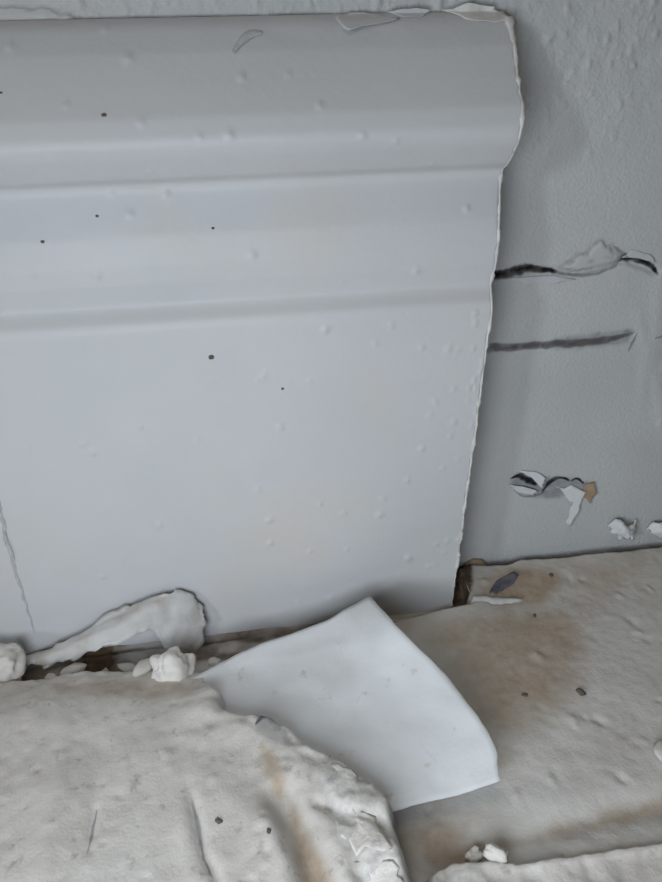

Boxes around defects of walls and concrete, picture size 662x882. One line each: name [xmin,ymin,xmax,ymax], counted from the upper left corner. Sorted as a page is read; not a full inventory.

peeling [335,3,509,30]
crack [494,241,657,284]
crack [493,335,633,351]
spalling [509,470,597,527]
peeling [608,519,662,541]
water stain [453,565,472,607]